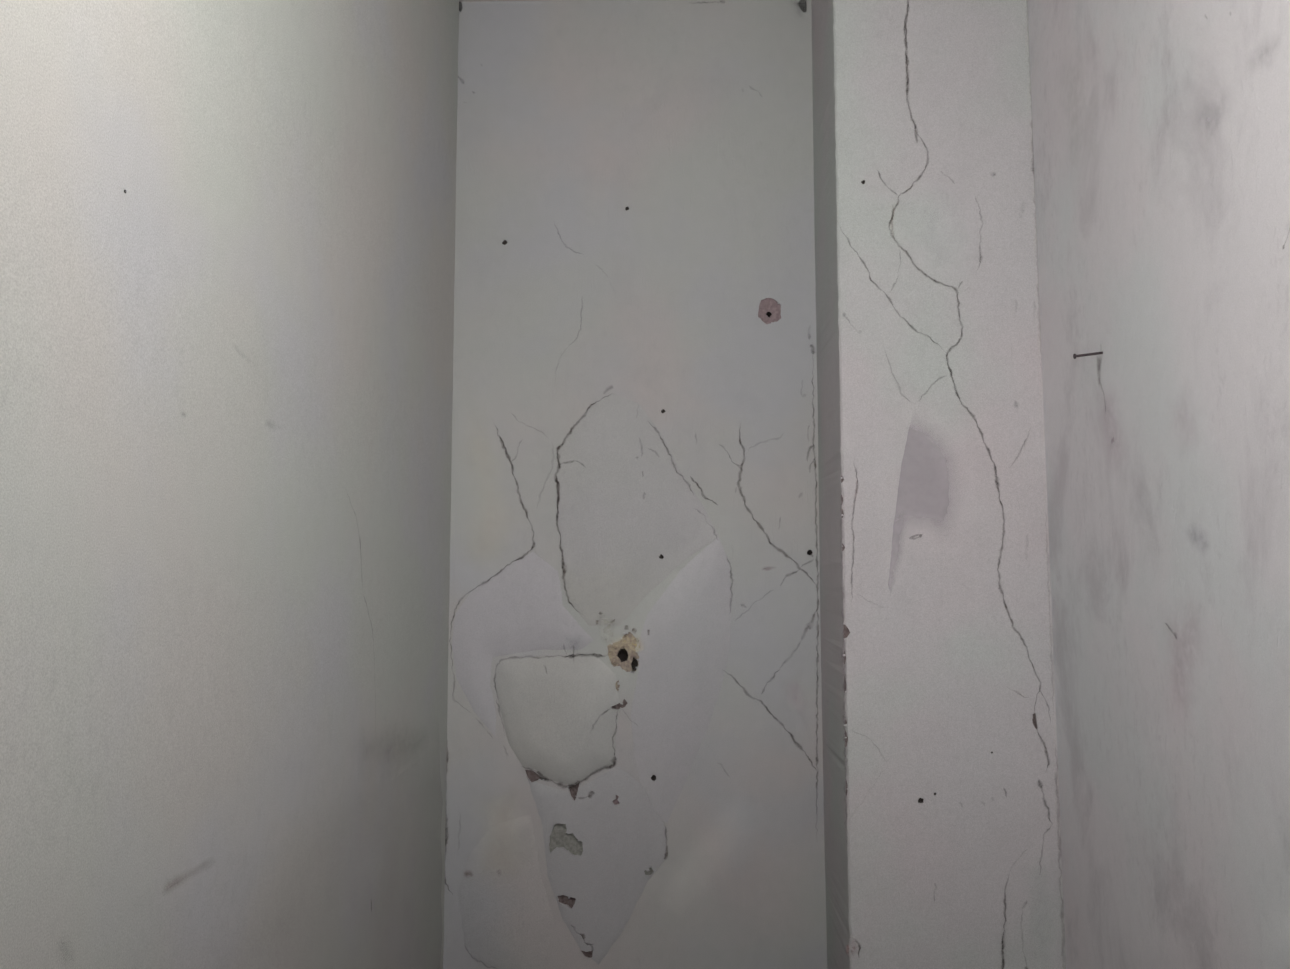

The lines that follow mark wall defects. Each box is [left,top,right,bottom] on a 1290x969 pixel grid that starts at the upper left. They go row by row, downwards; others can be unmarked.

spalling [758,298,781,324]
crack [488,403,595,611]
spalling [607,625,649,709]
spalling [525,770,544,782]
spalling [549,823,583,855]
spalling [557,895,576,908]